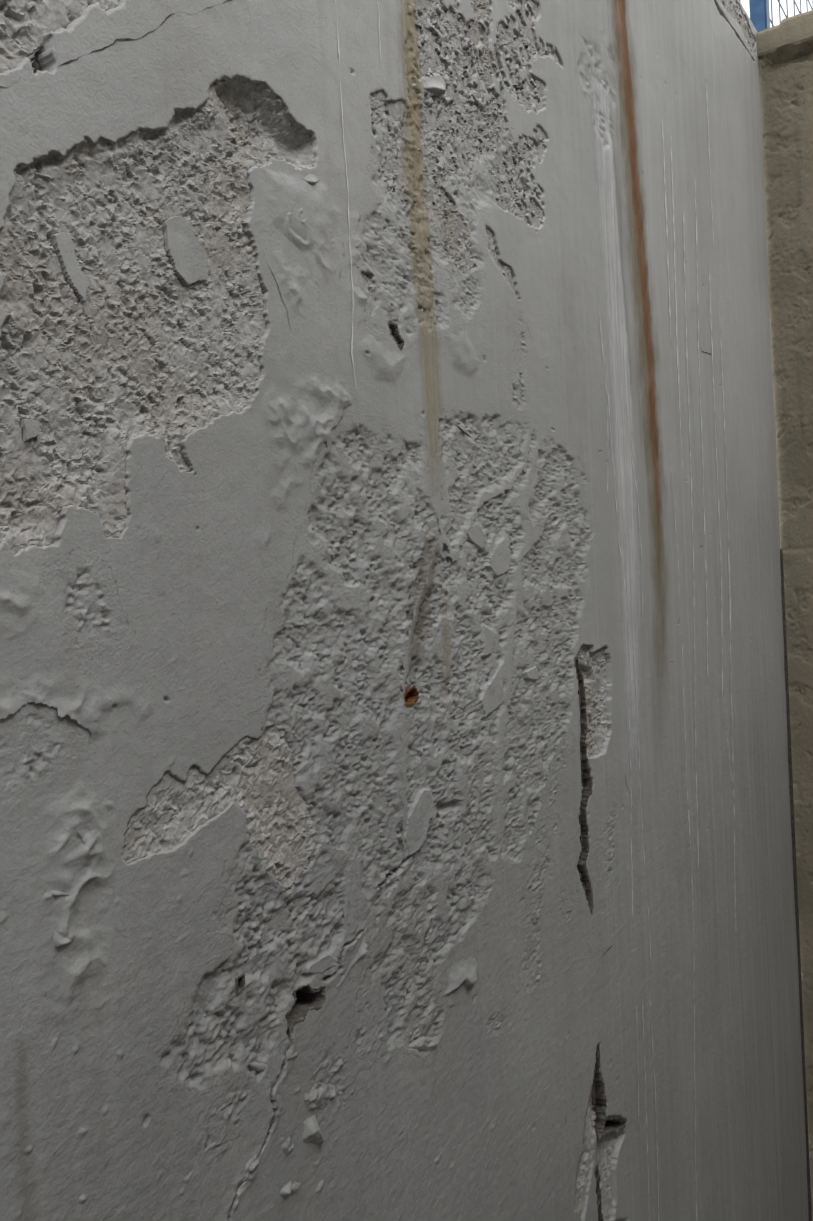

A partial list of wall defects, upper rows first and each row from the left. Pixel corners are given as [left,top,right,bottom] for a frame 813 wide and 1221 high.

flaking render [0,0,119,74]
crack [58,0,229,67]
flaking render [0,78,320,680]
flaking render [356,0,621,350]
rust [614,0,662,604]
flaking render [121,302,608,1136]
crack [574,656,593,915]
crack [592,1043,627,1221]